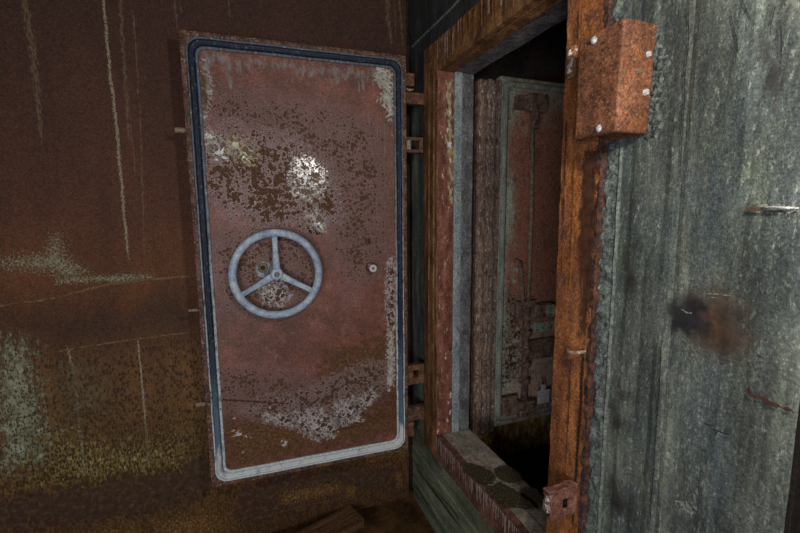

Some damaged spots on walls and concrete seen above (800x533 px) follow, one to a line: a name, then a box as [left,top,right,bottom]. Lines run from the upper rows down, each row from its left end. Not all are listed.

peeling [199,57,349,236]
corrosion [201,75,395,324]
peeling [372,67,394,124]
corrosion [561,122,598,335]
corrosion [216,332,397,468]
peeling [232,256,396,443]